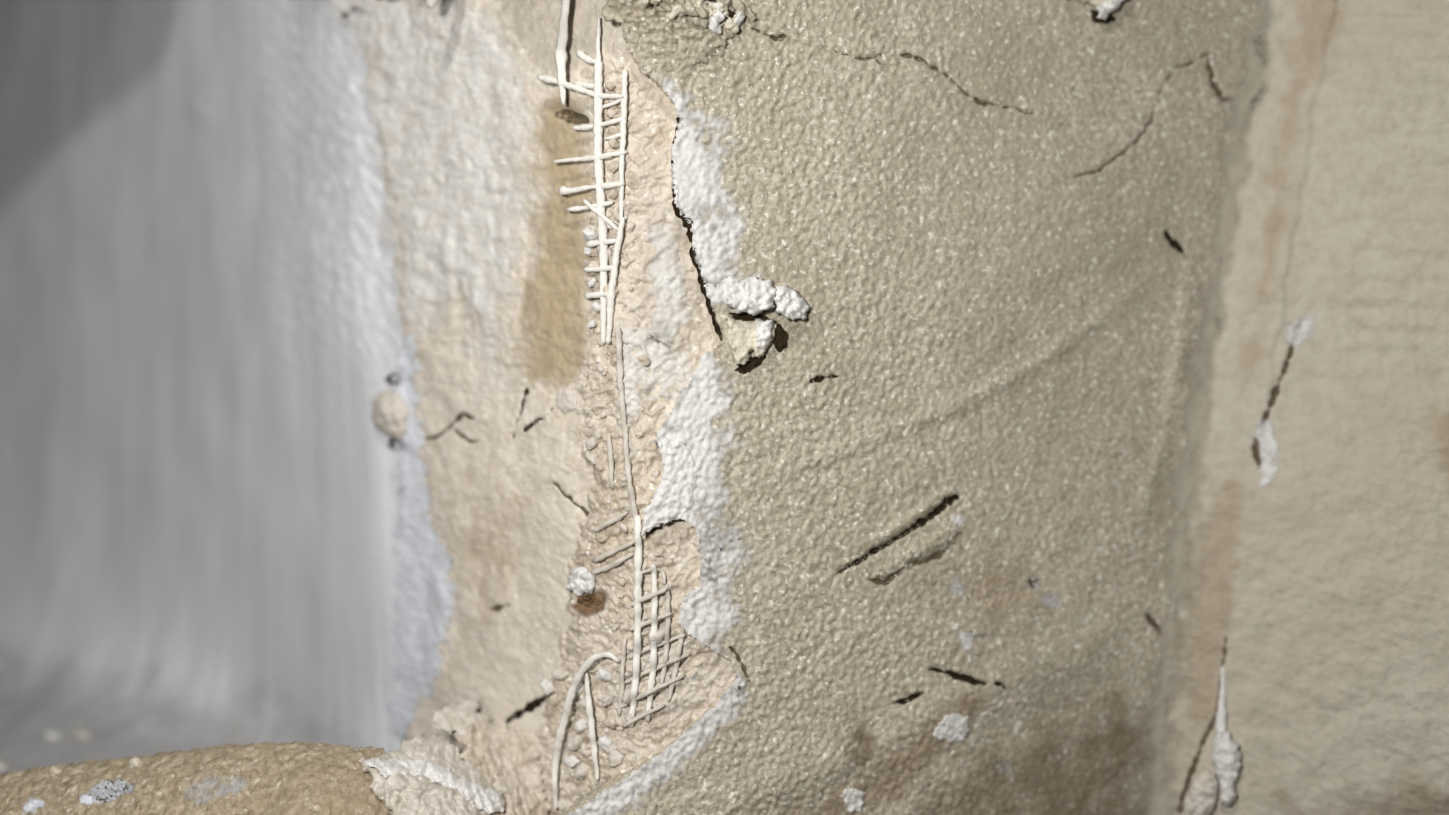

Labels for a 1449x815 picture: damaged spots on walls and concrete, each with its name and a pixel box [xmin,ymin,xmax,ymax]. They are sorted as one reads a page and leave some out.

crack [752,28,787,41]
crack [834,50,1035,114]
crack [1073,52,1211,178]
flaking render [535,16,810,815]
crack [1252,318,1302,469]
peeling [385,333,456,740]
crack [867,548,949,586]
crack [892,667,1008,705]
crack [1177,637,1227,813]